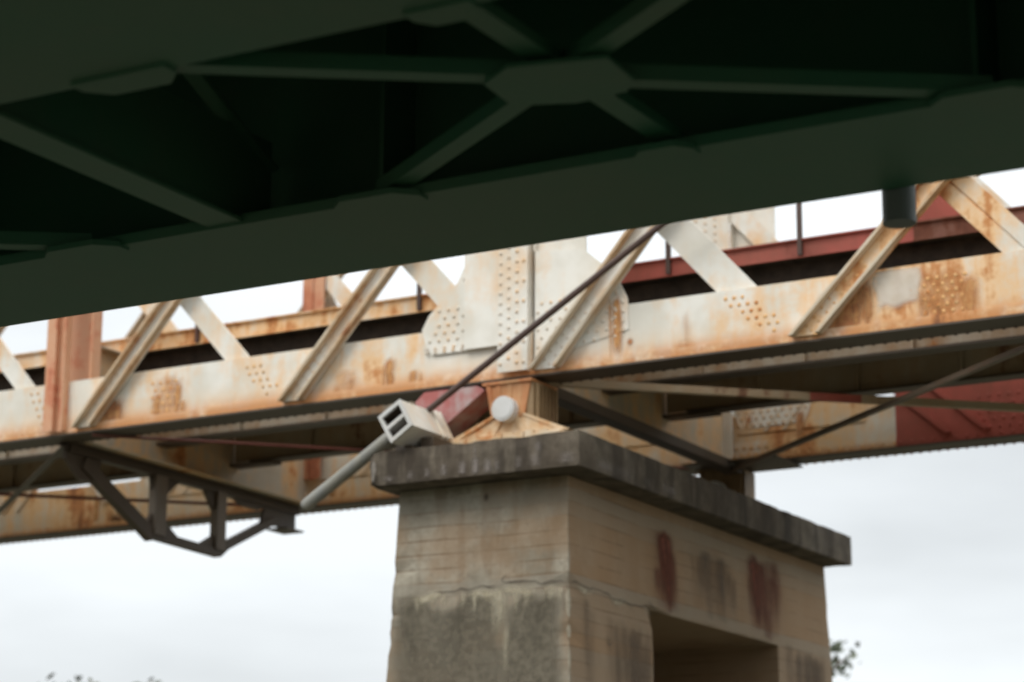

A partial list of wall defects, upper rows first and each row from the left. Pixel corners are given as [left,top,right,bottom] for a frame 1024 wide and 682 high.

corrosion [609,299,632,349]
corrosion [828,284,872,329]
corrosion [383,360,393,385]
corrosion [154,382,184,415]
crack [436,574,656,611]
corrosion [656,532,675,608]
corrosion [749,557,778,622]
leakage [400,586,561,682]